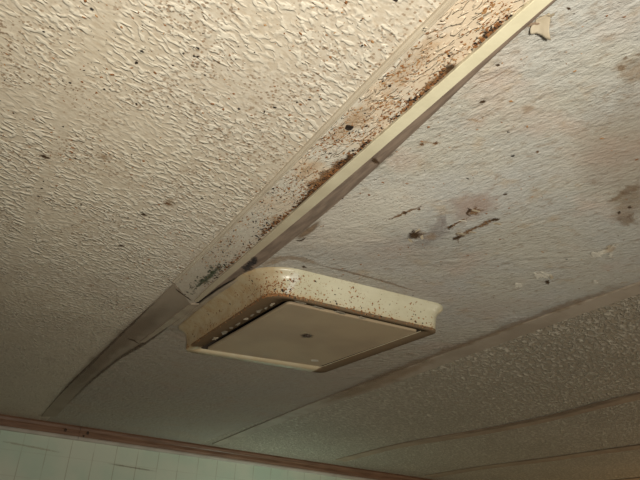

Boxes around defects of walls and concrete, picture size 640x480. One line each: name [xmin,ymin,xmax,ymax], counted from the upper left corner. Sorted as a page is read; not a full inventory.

peeling [528,13,555,40]
rust [189,0,514,287]
rust [187,271,397,347]